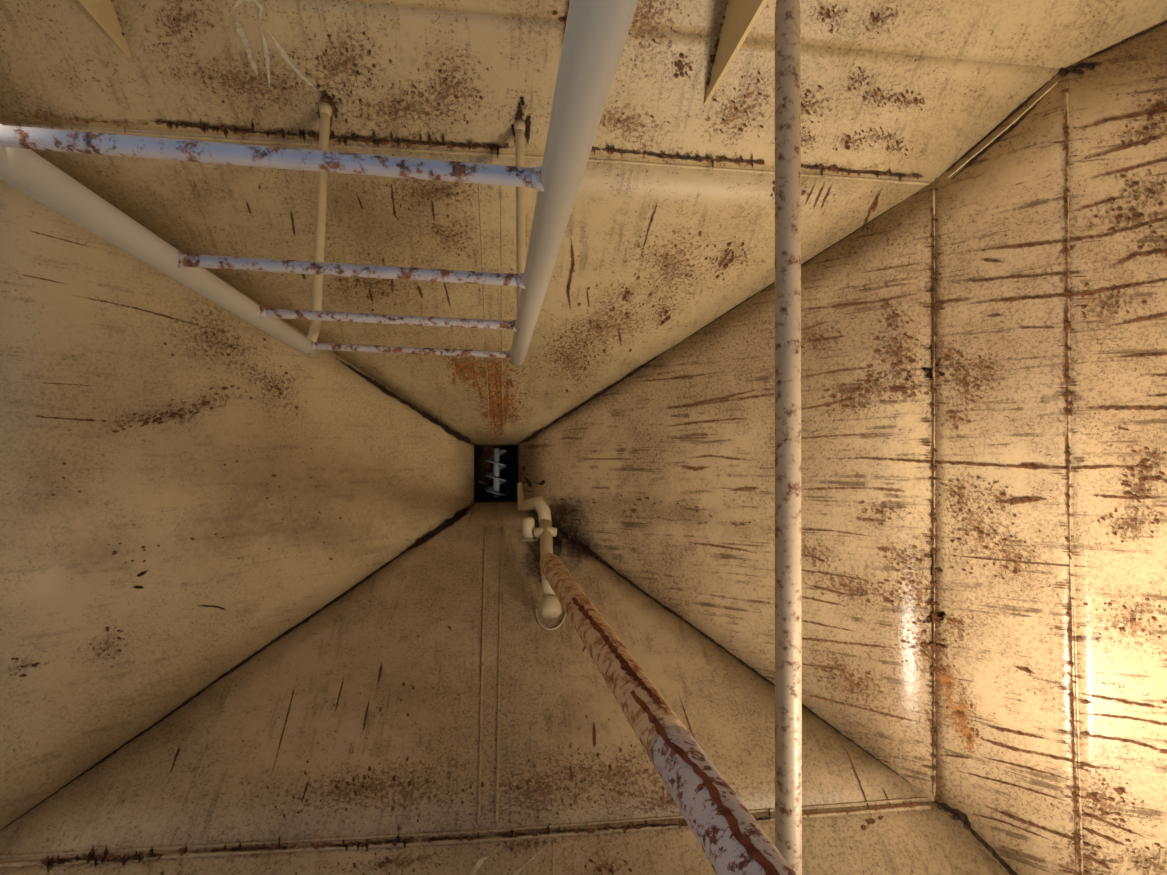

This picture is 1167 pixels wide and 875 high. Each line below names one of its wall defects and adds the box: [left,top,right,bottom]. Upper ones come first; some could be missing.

corrosion [438,205,751,479]
corrosion [670,390,773,408]